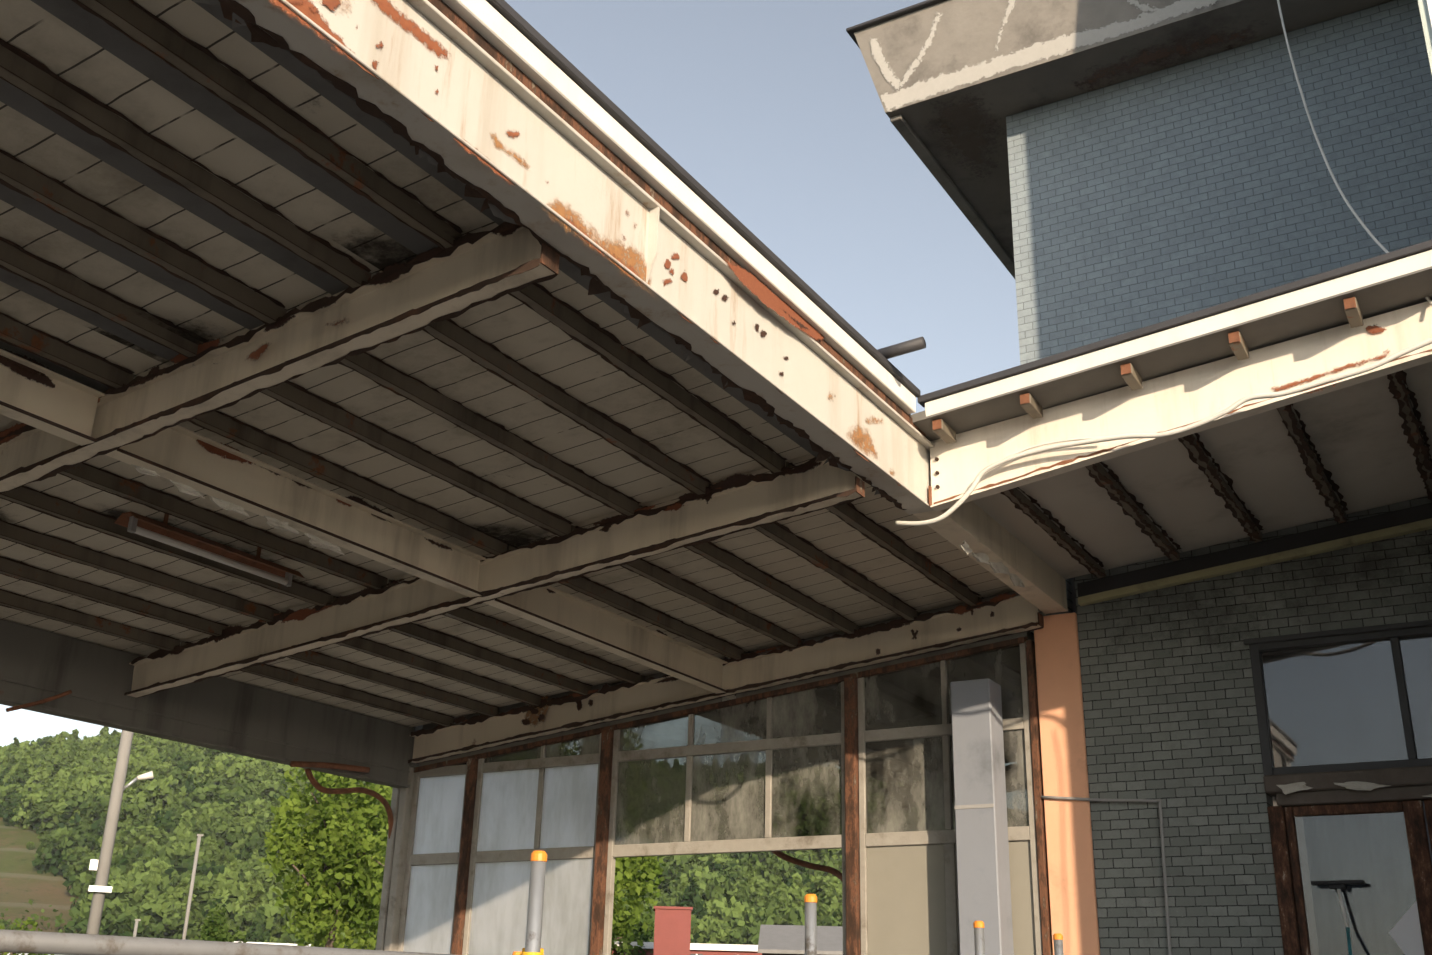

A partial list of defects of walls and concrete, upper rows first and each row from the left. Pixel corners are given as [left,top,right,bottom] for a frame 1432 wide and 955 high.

peeling [192,0,279,47]
peeling [409,142,518,225]
peeling [581,269,652,329]
rust [1365,325,1387,334]
rust [0,0,1038,763]
peeling [675,339,852,472]